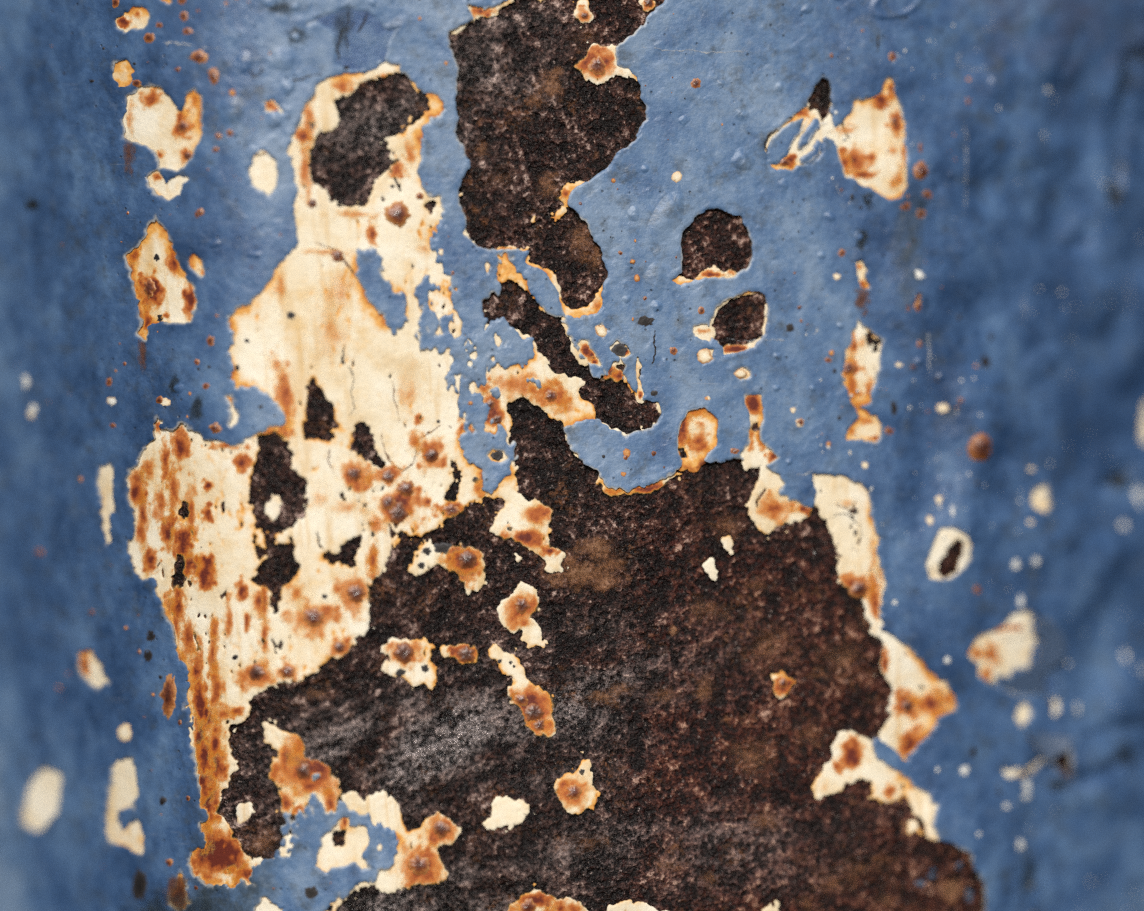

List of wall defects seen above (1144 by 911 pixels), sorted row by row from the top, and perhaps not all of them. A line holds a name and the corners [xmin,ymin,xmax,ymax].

peeling [116,6,149,32]
peeling [113,59,202,200]
peeling [98,464,115,543]
peeling [126,0,984,911]
corrosion [967,433,991,462]
corrosion [151,673,182,725]
peeling [968,611,1067,726]
peeling [106,758,144,854]